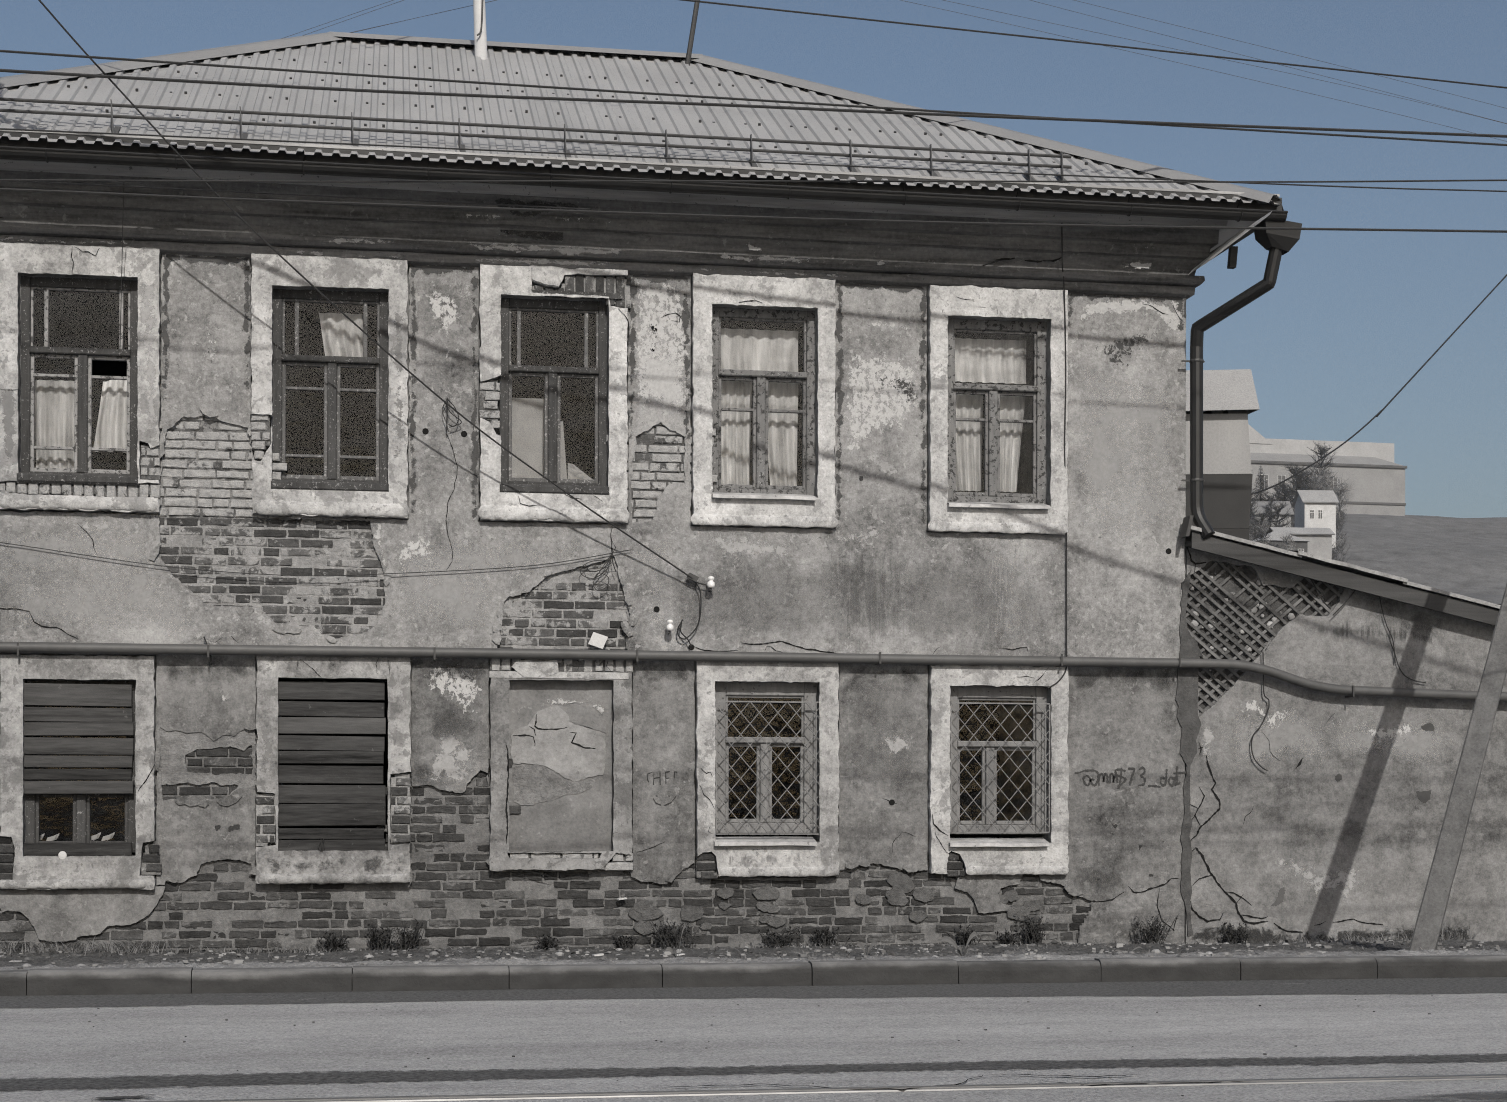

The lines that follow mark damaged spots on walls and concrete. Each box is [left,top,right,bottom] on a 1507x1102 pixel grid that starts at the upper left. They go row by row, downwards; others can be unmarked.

peeling [720,244,847,295]
flaking render [466,198,810,560]
flaking render [0,389,431,643]
crack [0,608,77,639]
flaking render [424,557,639,713]
flaking render [1185,561,1344,758]
flaking render [0,722,1095,953]
flaking render [509,698,606,814]
crack [1095,743,1383,933]